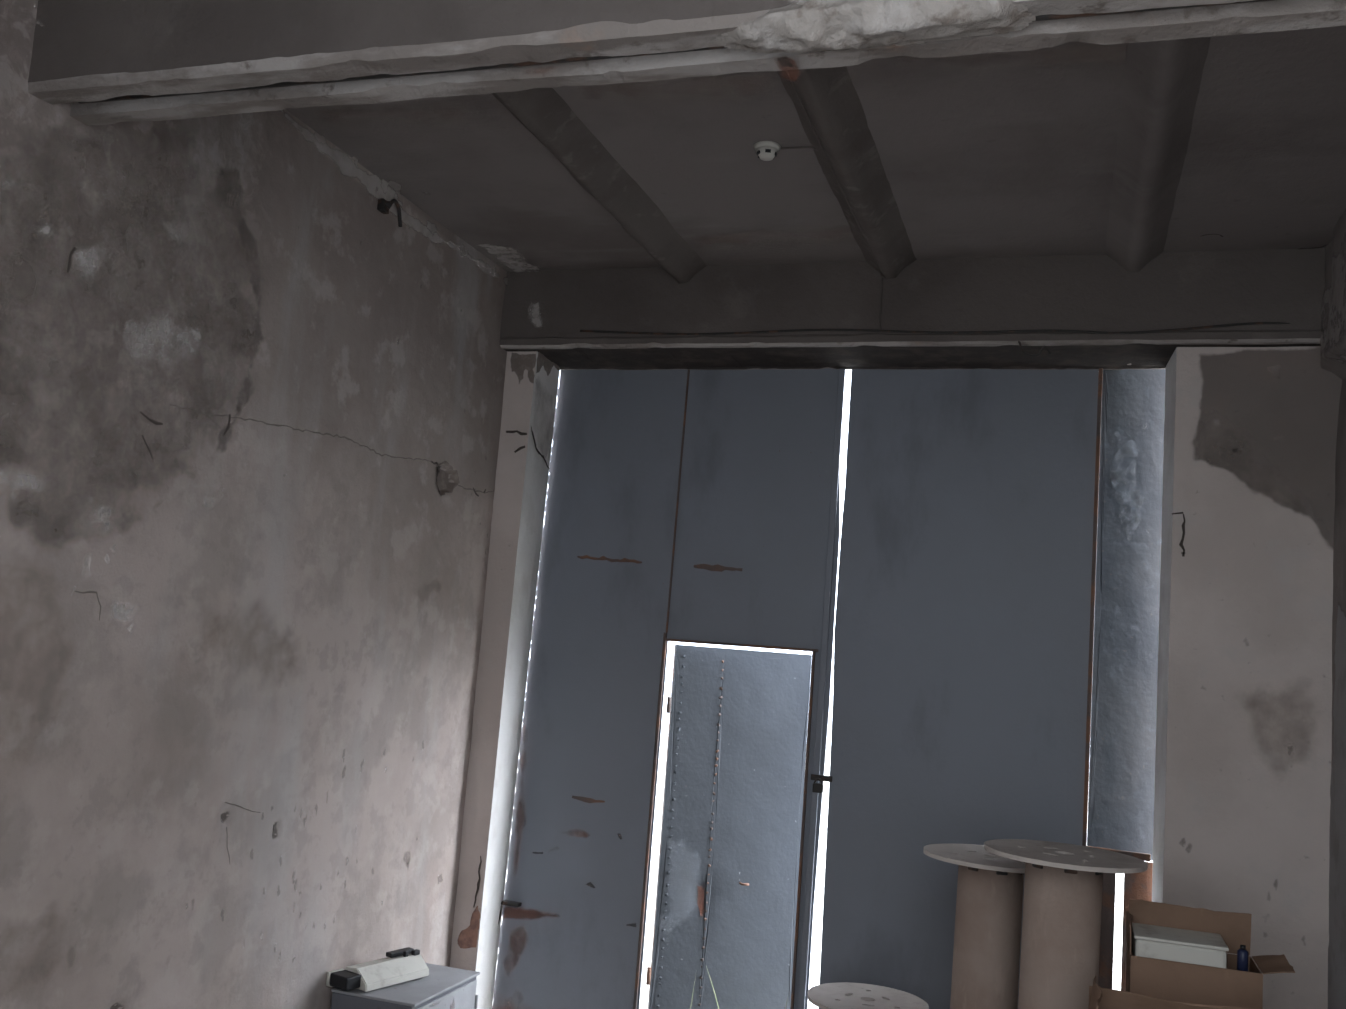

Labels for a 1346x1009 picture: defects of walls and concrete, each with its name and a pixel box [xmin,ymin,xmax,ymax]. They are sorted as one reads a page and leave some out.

leakage [0,131,262,538]
crack [170,404,495,497]
corrosion [503,907,557,961]